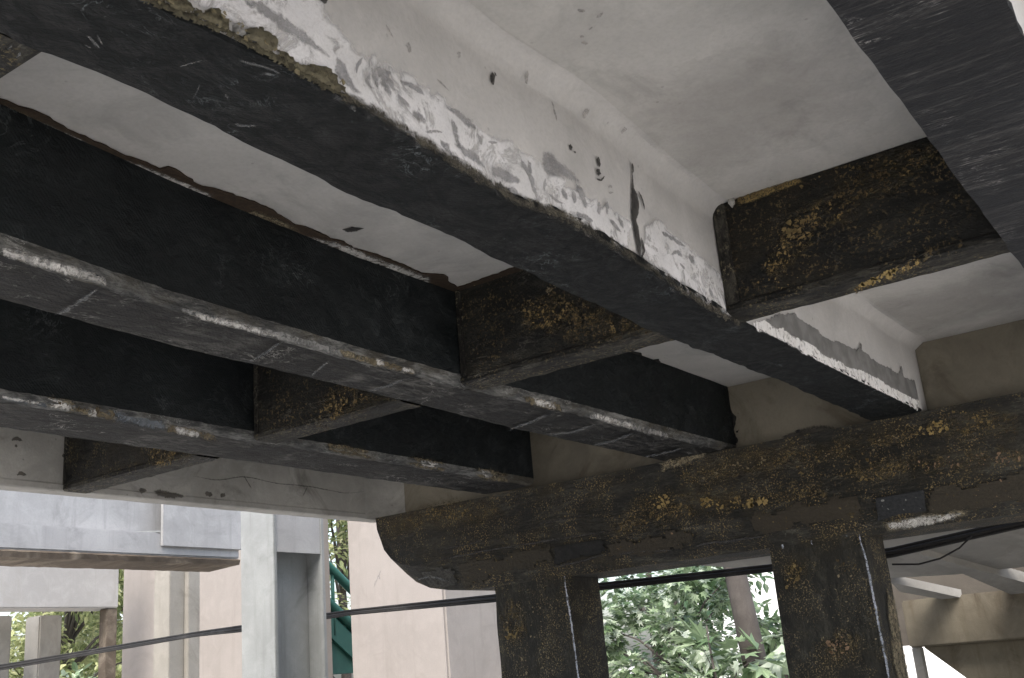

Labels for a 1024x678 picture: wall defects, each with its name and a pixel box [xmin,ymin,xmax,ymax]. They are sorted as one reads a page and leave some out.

peeling [0,98,523,292]
peeling [141,0,919,411]
leakage [859,534,890,678]